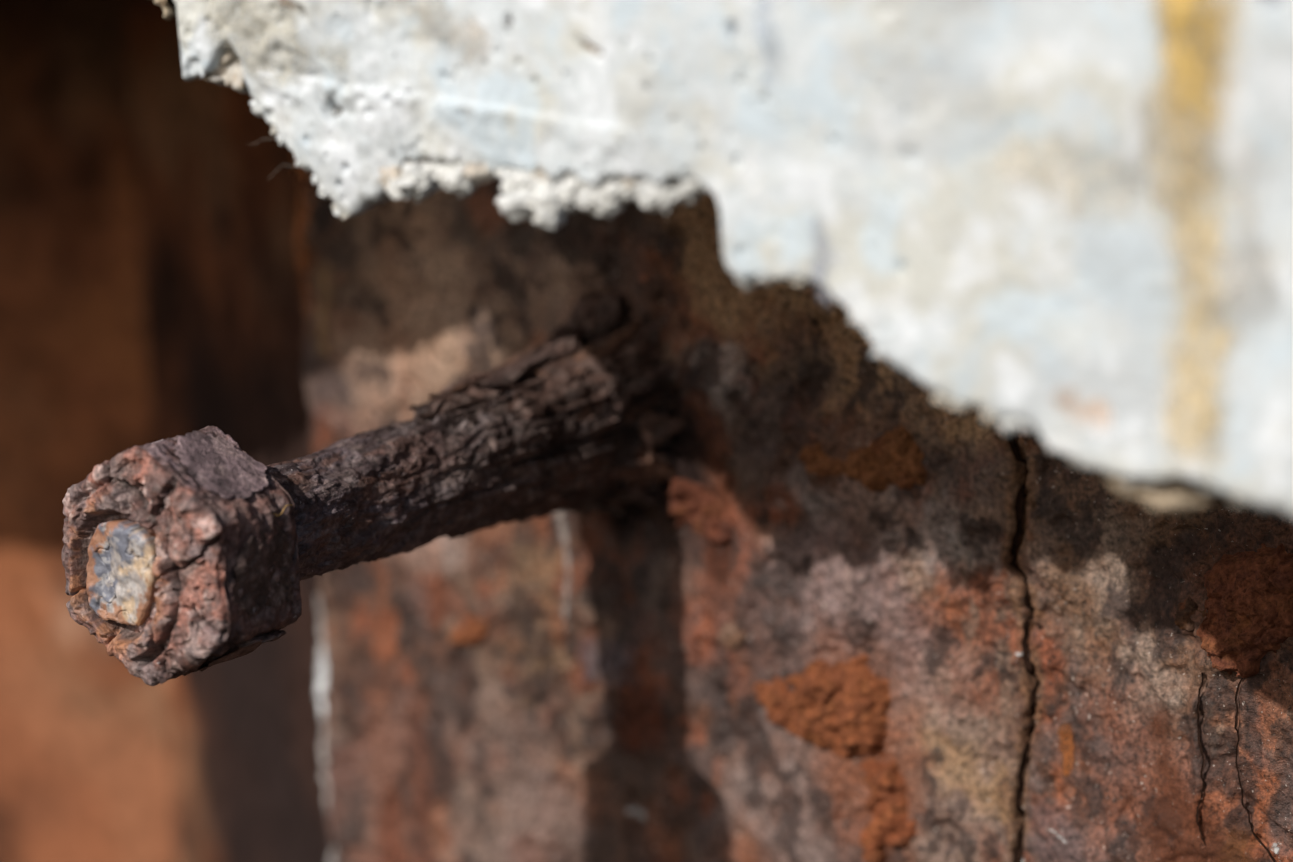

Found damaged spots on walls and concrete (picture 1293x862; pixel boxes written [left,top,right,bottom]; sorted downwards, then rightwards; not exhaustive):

spalling [378,158,708,230]
spalling [734,274,809,290]
peeling [408,291,687,455]
corrosion [786,425,927,492]
spalling [932,392,1037,435]
spalling [1070,457,1262,514]
crack [999,433,1043,862]
corrosion [1175,543,1293,678]
corrosion [753,654,918,862]
corrosion [1058,724,1074,776]
crack [1196,673,1206,846]
crack [1234,678,1275,862]